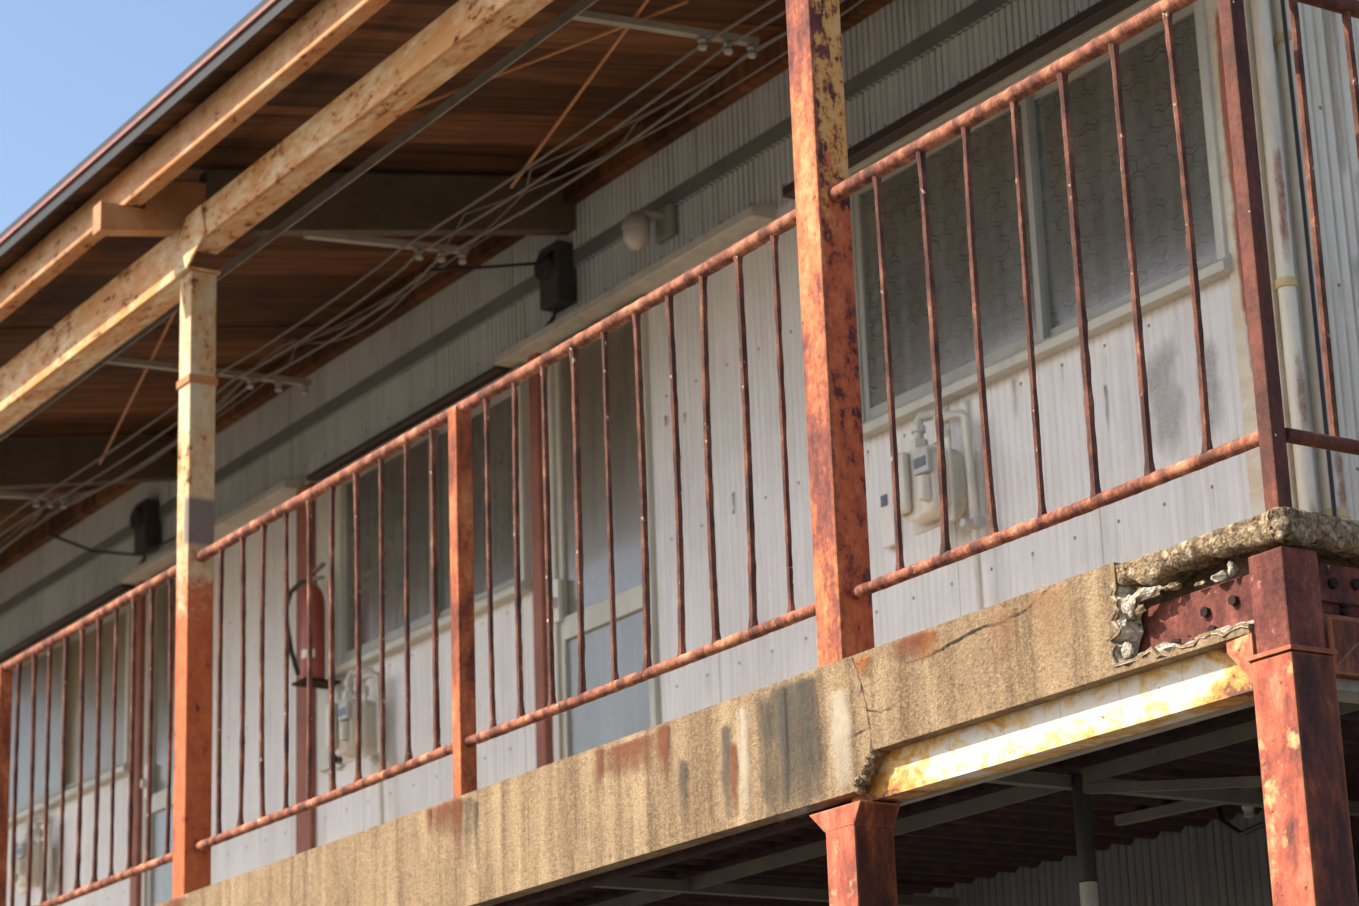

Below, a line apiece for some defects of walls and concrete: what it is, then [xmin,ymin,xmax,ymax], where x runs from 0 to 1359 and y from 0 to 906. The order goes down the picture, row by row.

crack [908,586,1050,663]
spalling [1107,561,1254,667]
rust [595,725,668,773]
crack [821,658,893,750]